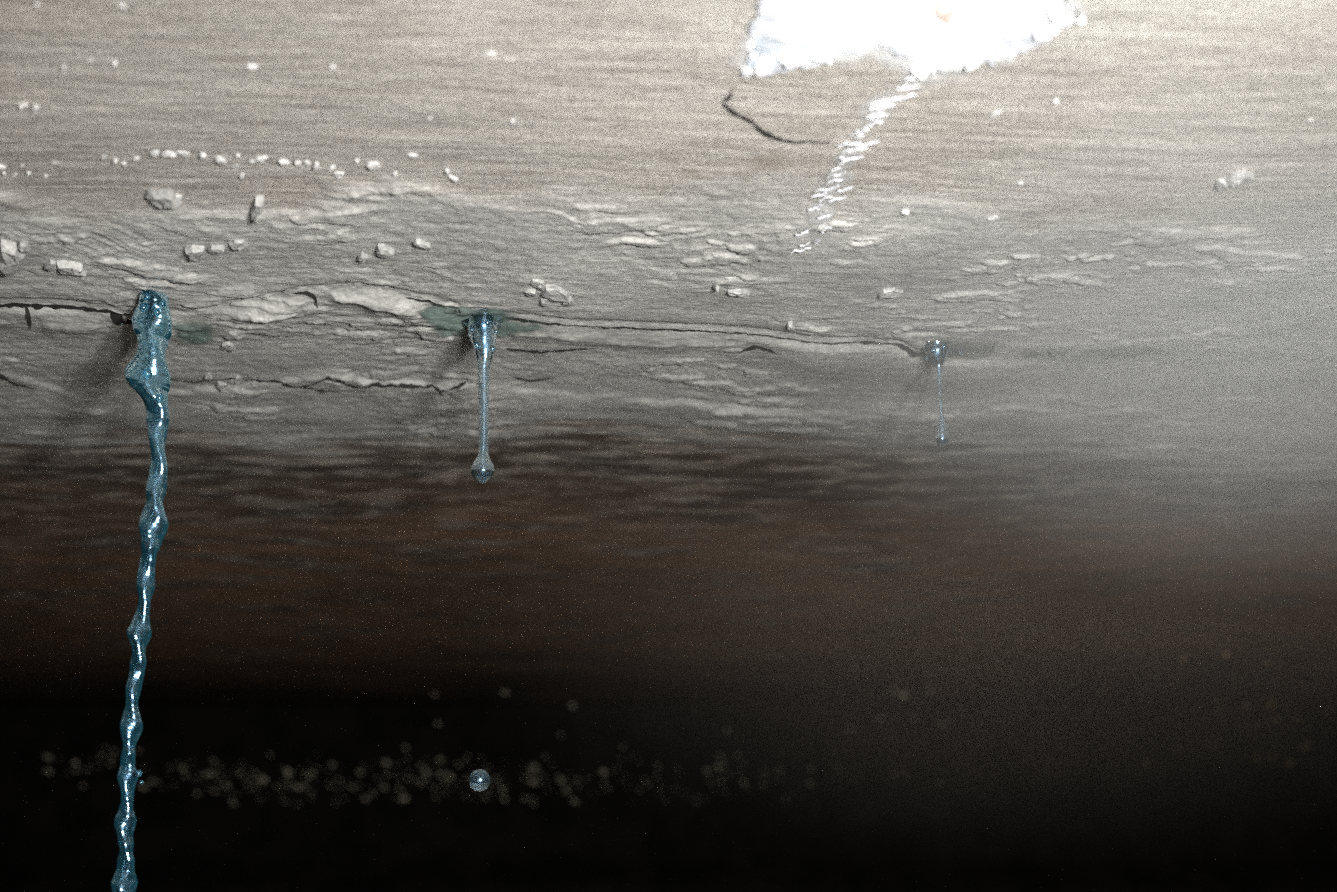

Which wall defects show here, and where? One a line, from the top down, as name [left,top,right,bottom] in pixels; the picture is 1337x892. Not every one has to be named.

crack [723,89,832,143]
damp [790,77,919,254]
peeling [0,239,31,277]
peeling [44,260,87,277]
peeling [185,239,248,261]
crack [0,303,132,328]
crack [295,291,318,308]
crack [407,297,461,313]
peeling [524,279,574,307]
peeling [712,283,750,297]
crack [171,317,926,394]
damp [44,290,790,892]